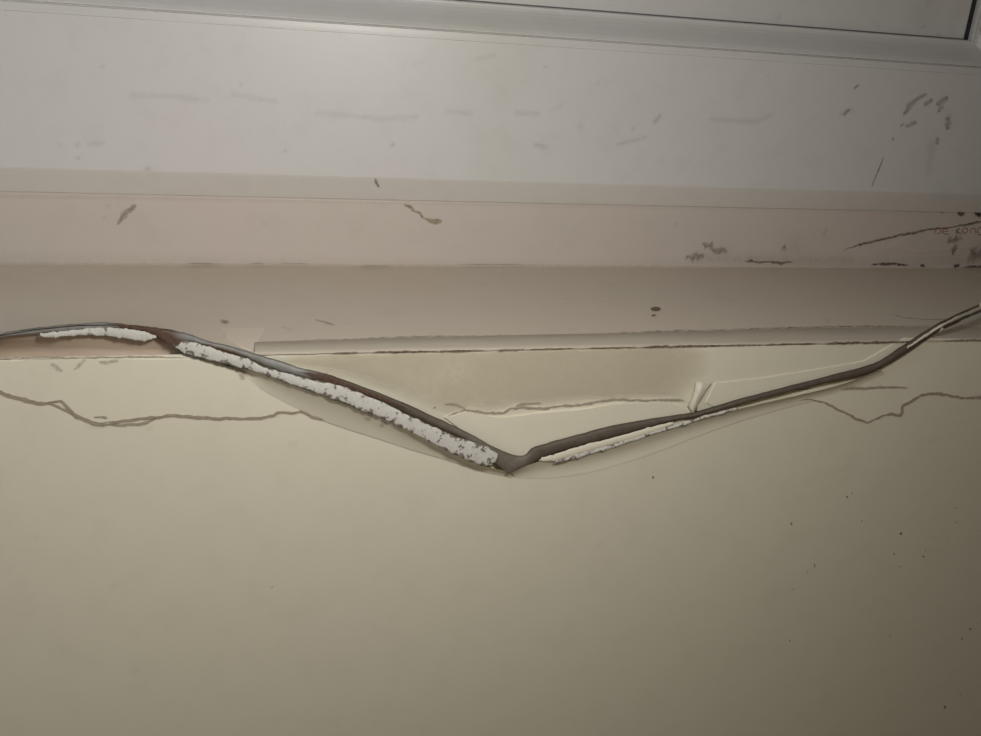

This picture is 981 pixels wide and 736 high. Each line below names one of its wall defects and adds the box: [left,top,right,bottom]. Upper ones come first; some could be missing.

peeling [0,328,300,423]
crack [0,391,322,426]
flaking render [255,326,981,463]
crack [800,386,981,423]